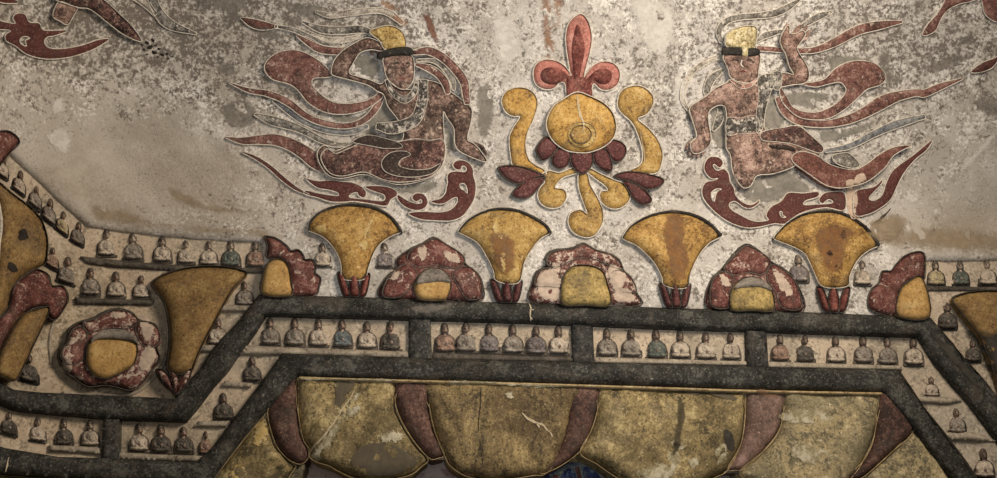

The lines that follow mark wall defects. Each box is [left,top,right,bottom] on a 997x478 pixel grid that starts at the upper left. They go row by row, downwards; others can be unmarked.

leakage [870,216,997,248]
peeling [536,262,561,302]
peeling [608,264,634,303]
peeling [772,269,793,296]
crack [522,412,553,437]